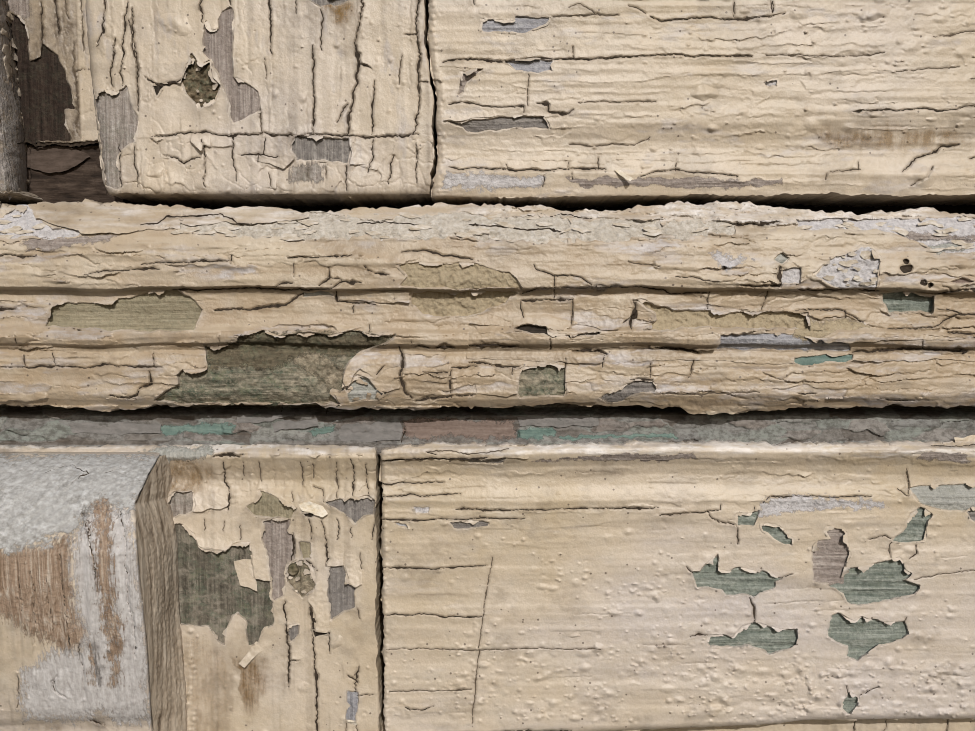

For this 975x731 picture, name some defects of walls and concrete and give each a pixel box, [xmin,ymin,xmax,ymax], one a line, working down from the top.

peeling [0,0,735,252]
crack [17,0,975,190]
peeling [566,170,783,190]
crack [140,213,252,225]
crack [173,255,389,332]
crack [469,213,592,232]
peeling [775,253,801,284]
peeling [795,216,975,255]
peeling [813,247,975,314]
crack [6,338,160,398]
peeling [0,262,975,730]
crack [283,601,330,731]